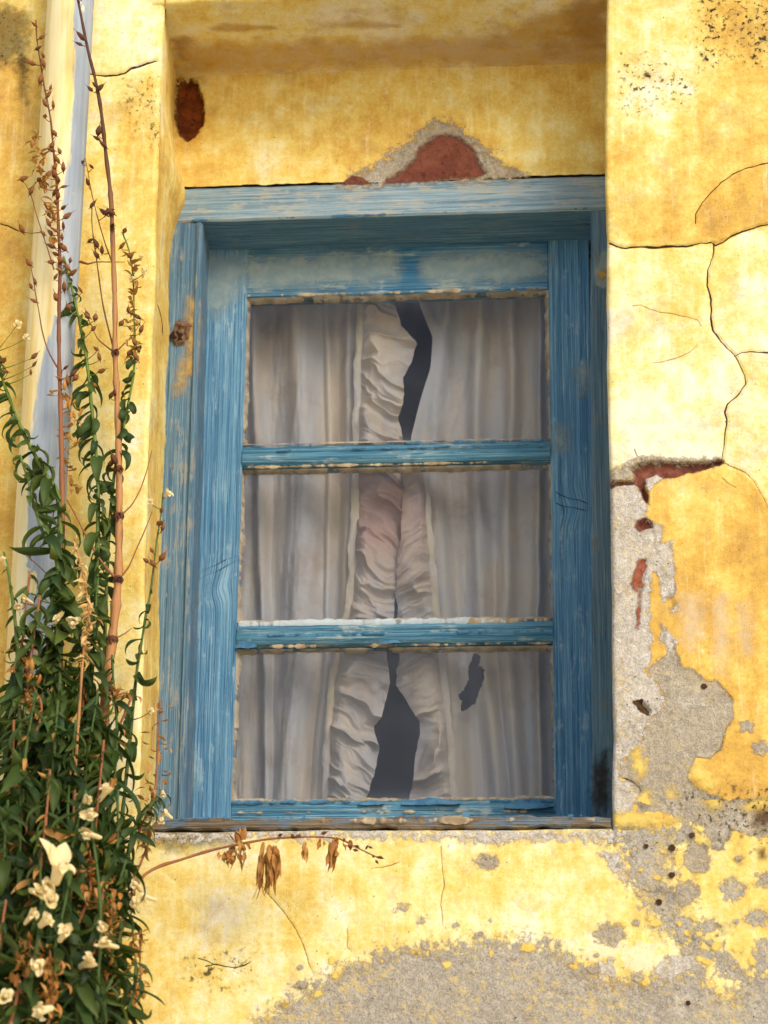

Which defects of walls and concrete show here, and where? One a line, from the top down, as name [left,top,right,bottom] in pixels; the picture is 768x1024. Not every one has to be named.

leakage [696,0,768,68]
crack [90,61,157,77]
spalling [174,79,205,142]
leakage [618,53,696,112]
spalling [336,116,530,191]
crack [609,163,768,505]
peeling [151,455,768,1024]